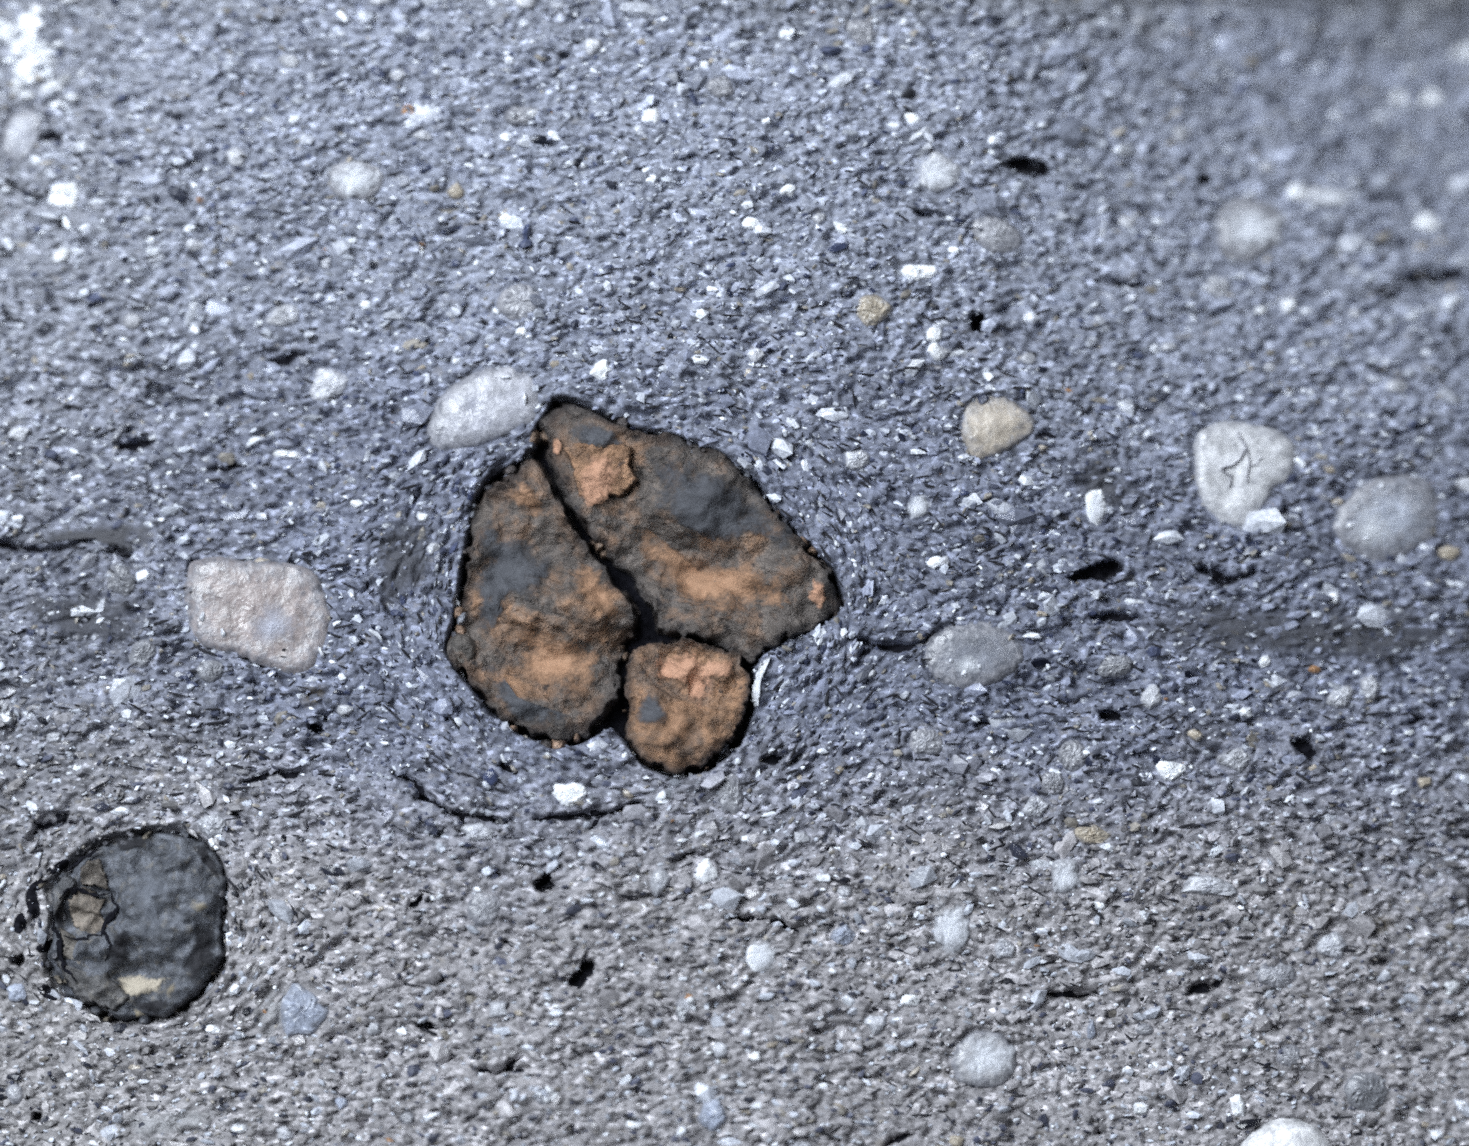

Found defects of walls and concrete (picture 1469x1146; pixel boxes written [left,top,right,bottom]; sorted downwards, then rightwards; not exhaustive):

rust [512,483,540,516]
rust [580,457,618,506]
rust [576,567,616,615]
rust [644,533,780,610]
rust [809,579,825,608]
rust [520,630,597,690]
rust [645,653,733,704]
rust [669,715,688,737]